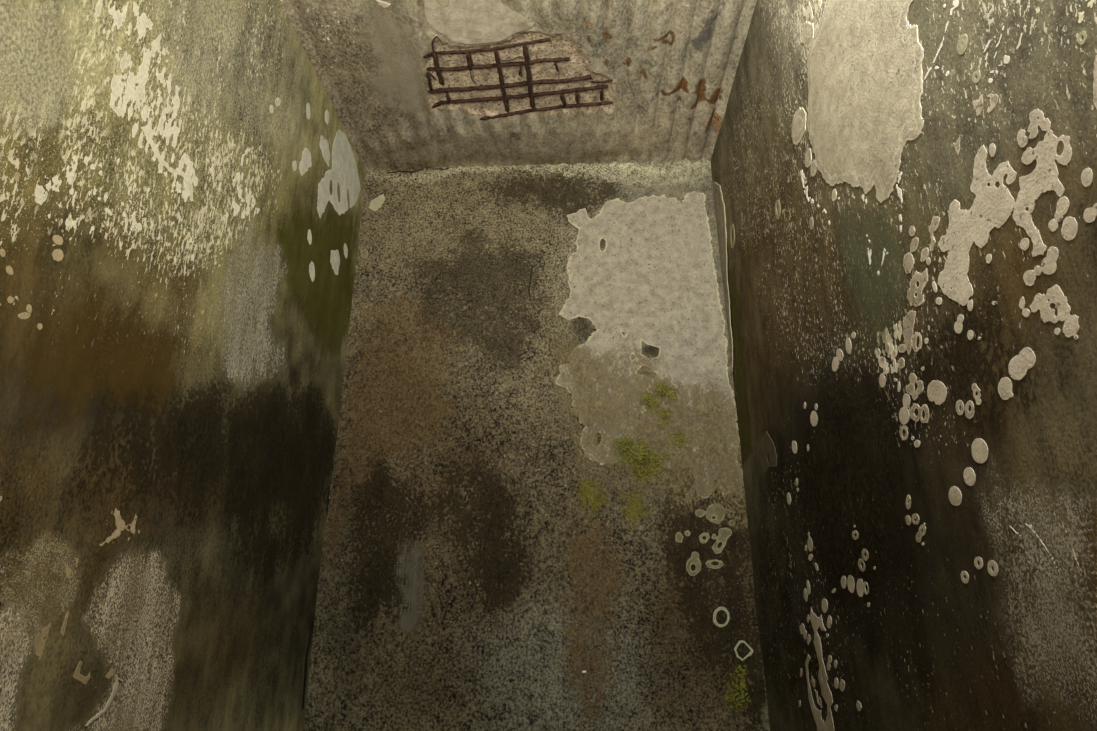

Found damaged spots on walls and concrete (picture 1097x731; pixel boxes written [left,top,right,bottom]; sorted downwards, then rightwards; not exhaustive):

peeling [292,110,361,218]
spalling [421,31,620,120]
flaking render [791,0,924,203]
peeling [972,93,998,116]
peeling [0,296,43,330]
water stain [24,219,338,585]
peeling [330,243,348,275]
flaking render [555,182,744,569]
peeling [875,109,1097,447]
water stain [346,455,535,633]
peeling [798,525,876,731]